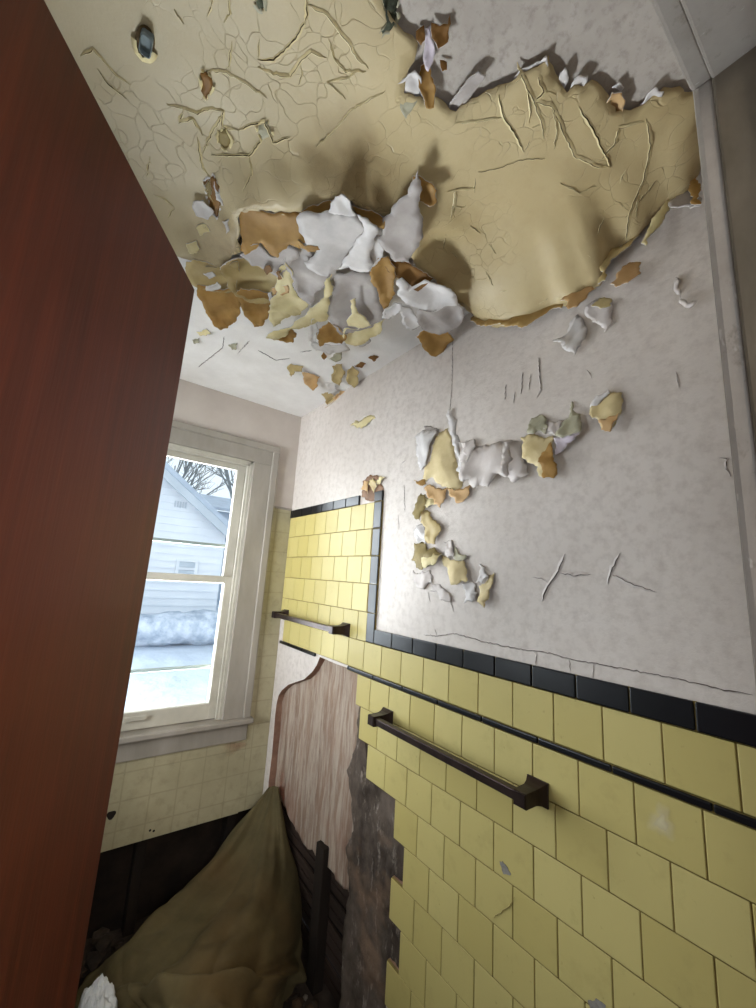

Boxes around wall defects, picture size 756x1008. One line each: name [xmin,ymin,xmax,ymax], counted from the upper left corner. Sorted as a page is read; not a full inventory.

crack [80,47,130,99]
crack [206,0,385,147]
crack [167,104,290,202]
peeling [44,0,702,409]
peeling [361,475,385,502]
peeling [412,390,623,608]
crack [534,553,656,601]
crack [425,583,752,695]
spalling [234,808,252,827]
spalling [86,843,134,940]
spalling [135,818,223,922]